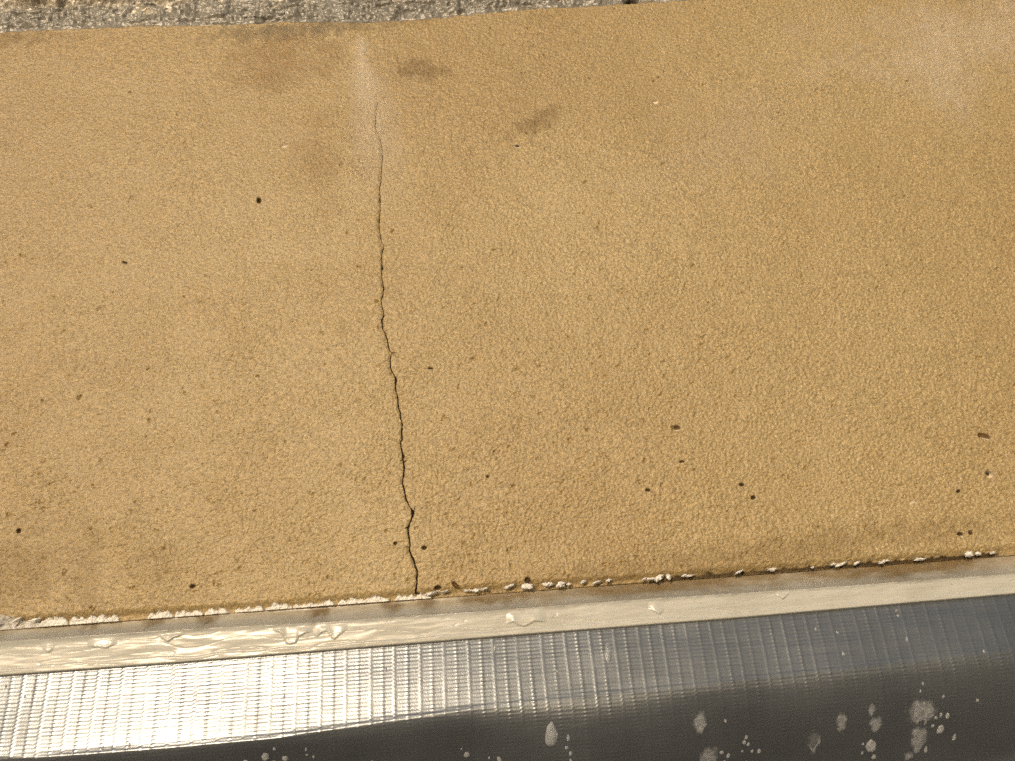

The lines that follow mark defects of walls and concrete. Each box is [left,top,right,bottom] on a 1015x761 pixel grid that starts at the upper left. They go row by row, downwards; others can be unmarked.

crack [375,109,419,594]